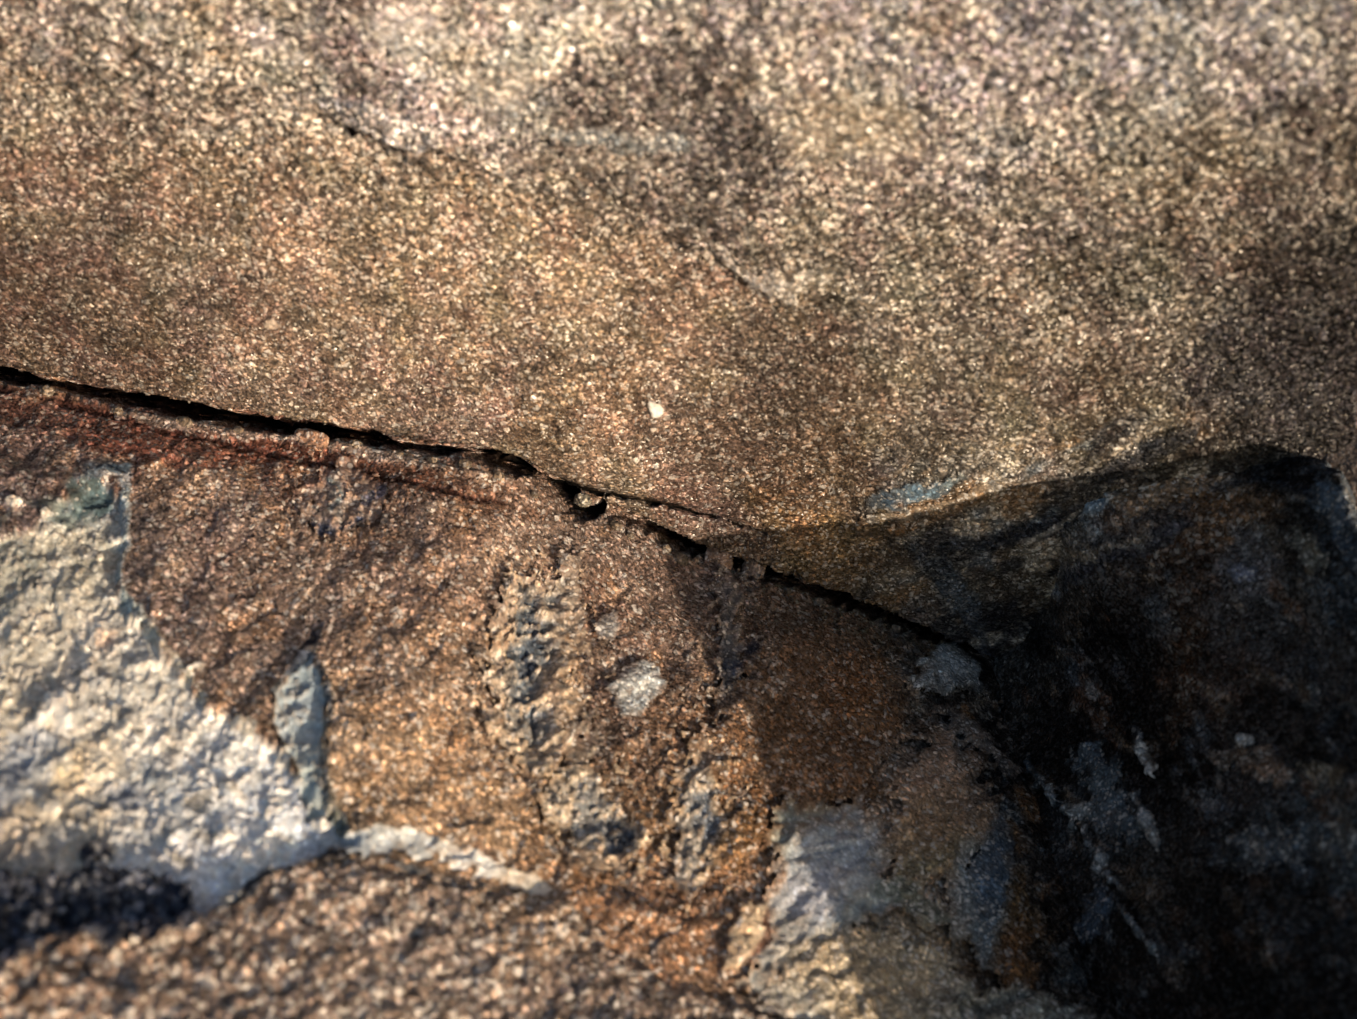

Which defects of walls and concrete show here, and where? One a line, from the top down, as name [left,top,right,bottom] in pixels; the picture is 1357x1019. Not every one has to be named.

corrosion [0,380,555,525]
crack [0,366,999,685]
water stain [1019,421,1357,577]
efflorescence [1227,562,1259,585]
spalling [0,456,1083,1019]
corrosion [681,505,957,880]
water stain [866,472,1203,974]
water stain [1234,732,1256,747]
water stain [1187,807,1357,883]
peeling [1209,743,1350,791]